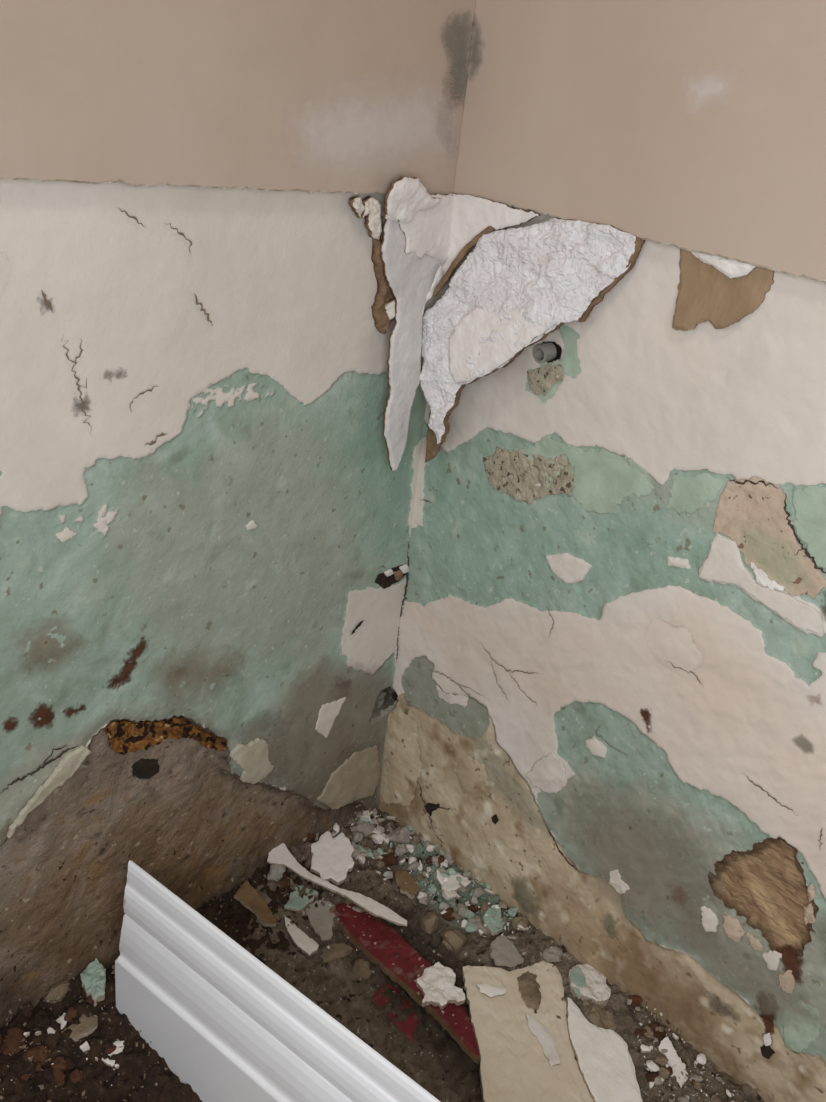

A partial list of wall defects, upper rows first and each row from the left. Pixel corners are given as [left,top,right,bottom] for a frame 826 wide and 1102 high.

peeling [0,176,826,845]
corrosion [108,637,146,688]
crack [433,643,539,708]
corrosion [4,718,18,731]
corrosion [31,705,85,727]
flaking render [0,656,826,1102]